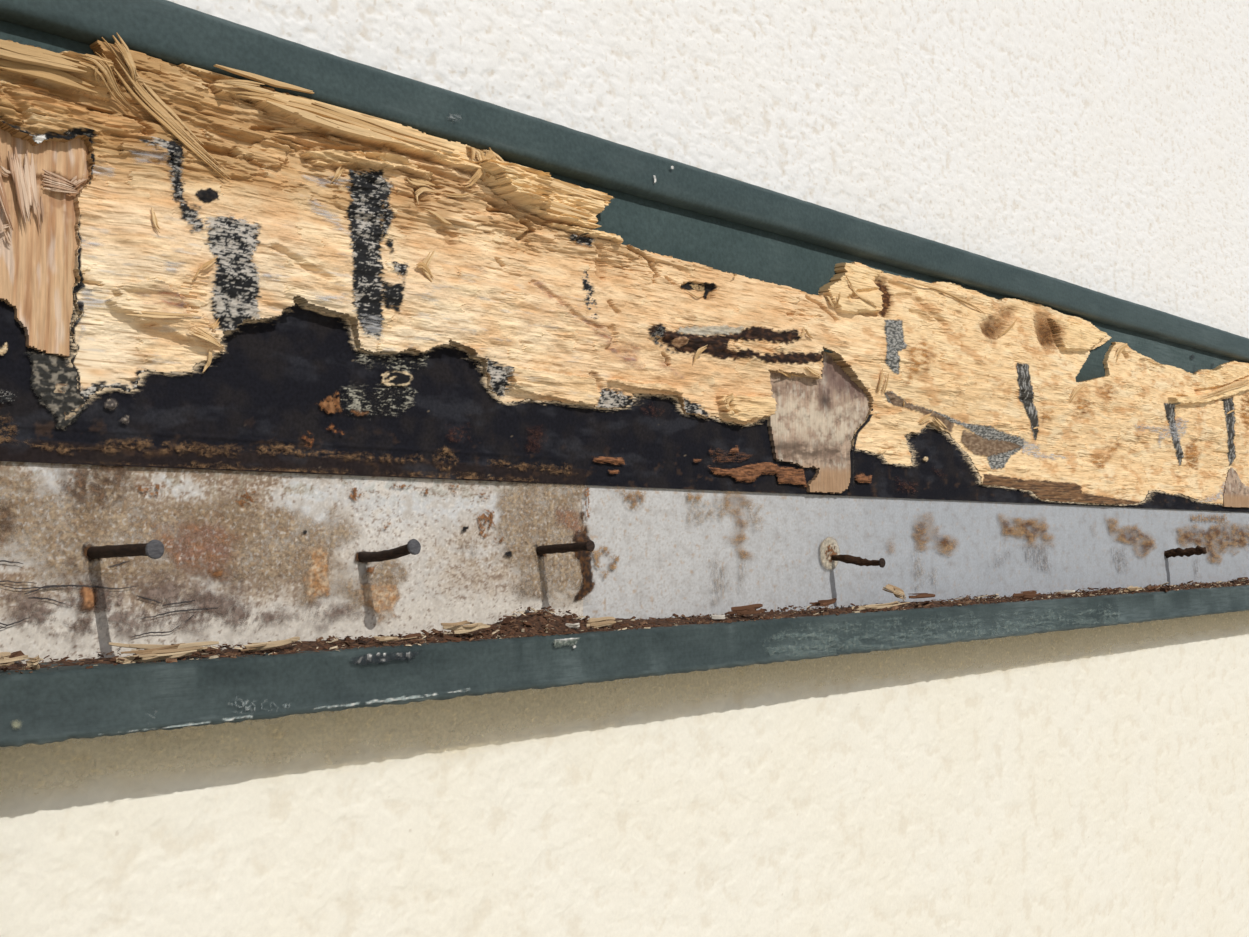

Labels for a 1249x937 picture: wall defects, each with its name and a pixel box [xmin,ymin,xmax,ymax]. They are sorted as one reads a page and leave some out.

peeling [380,199,409,311]
spalling [649,324,823,364]
peeling [319,392,341,413]
peeling [381,371,412,386]
peeling [593,456,625,474]
peeling [694,447,807,487]
corrosion [462,493,512,557]
corrosion [573,487,619,601]
corrosion [820,537,840,569]
corrosion [1178,514,1249,572]
crack [0,560,212,637]
corrosion [344,551,408,621]